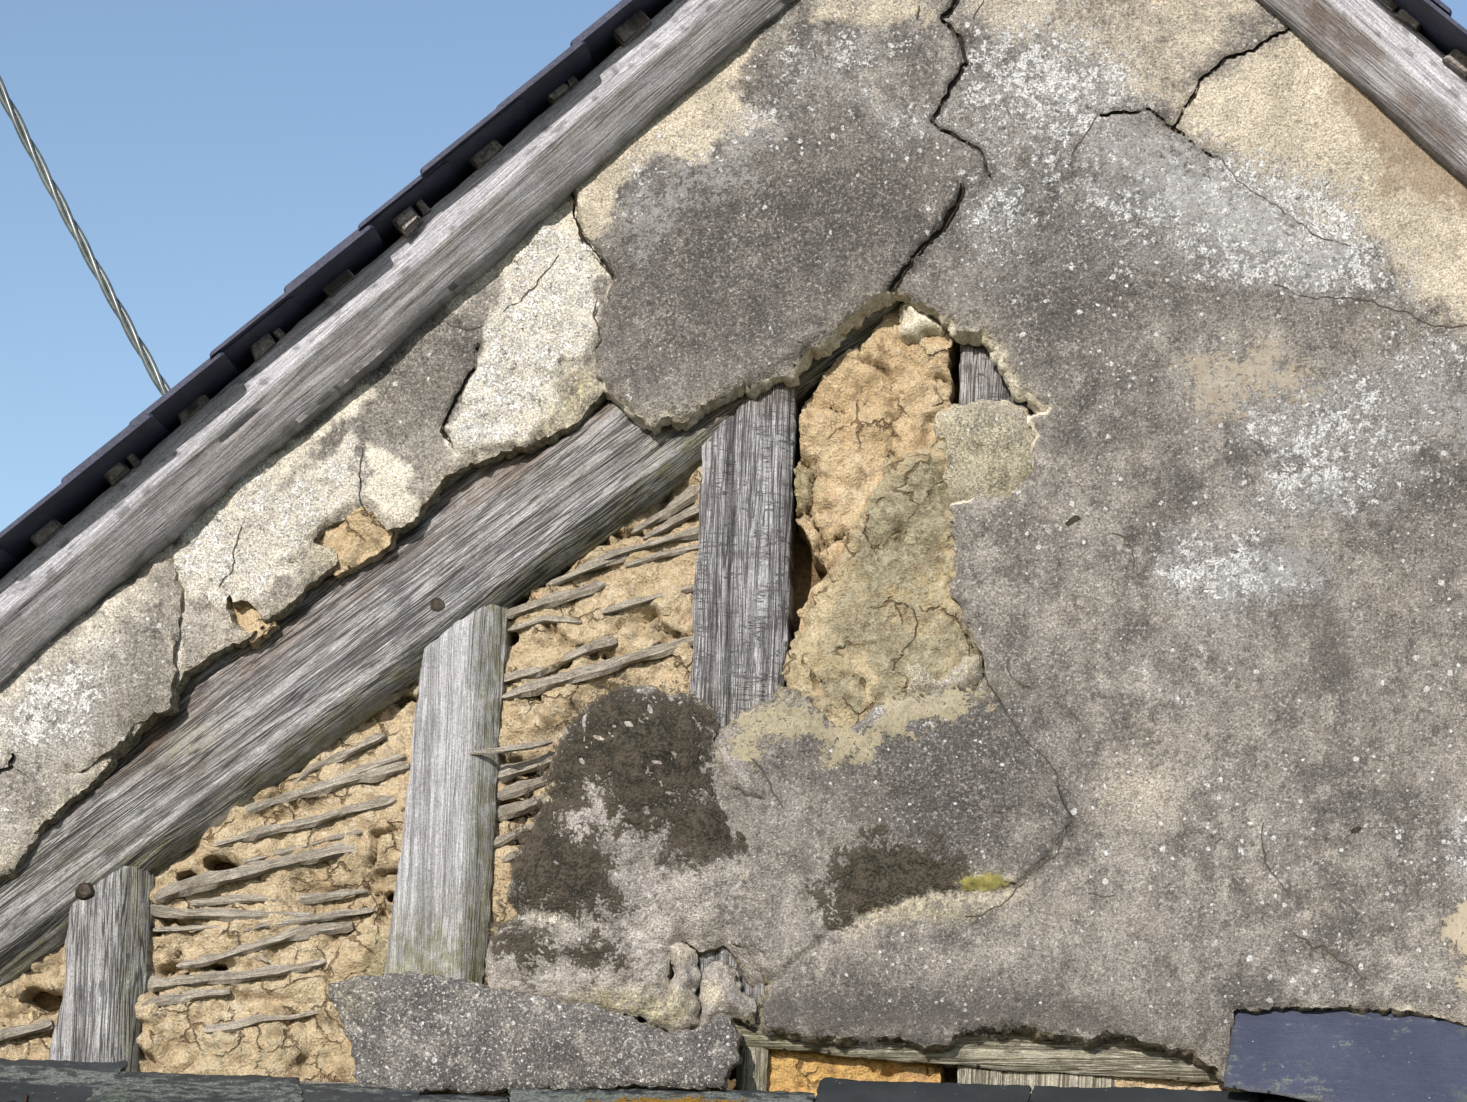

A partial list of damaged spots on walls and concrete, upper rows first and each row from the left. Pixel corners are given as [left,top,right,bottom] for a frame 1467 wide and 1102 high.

crack [889,0,992,292]
crack [1071,15,1351,246]
crack [439,192,614,452]
crack [1274,284,1467,328]
spalling [231,601,280,649]
spalling [317,506,399,579]
flaking render [593,288,1052,732]
crack [890,599,918,652]
crack [0,753,42,797]
water stain [484,673,997,984]
crack [955,613,1076,917]